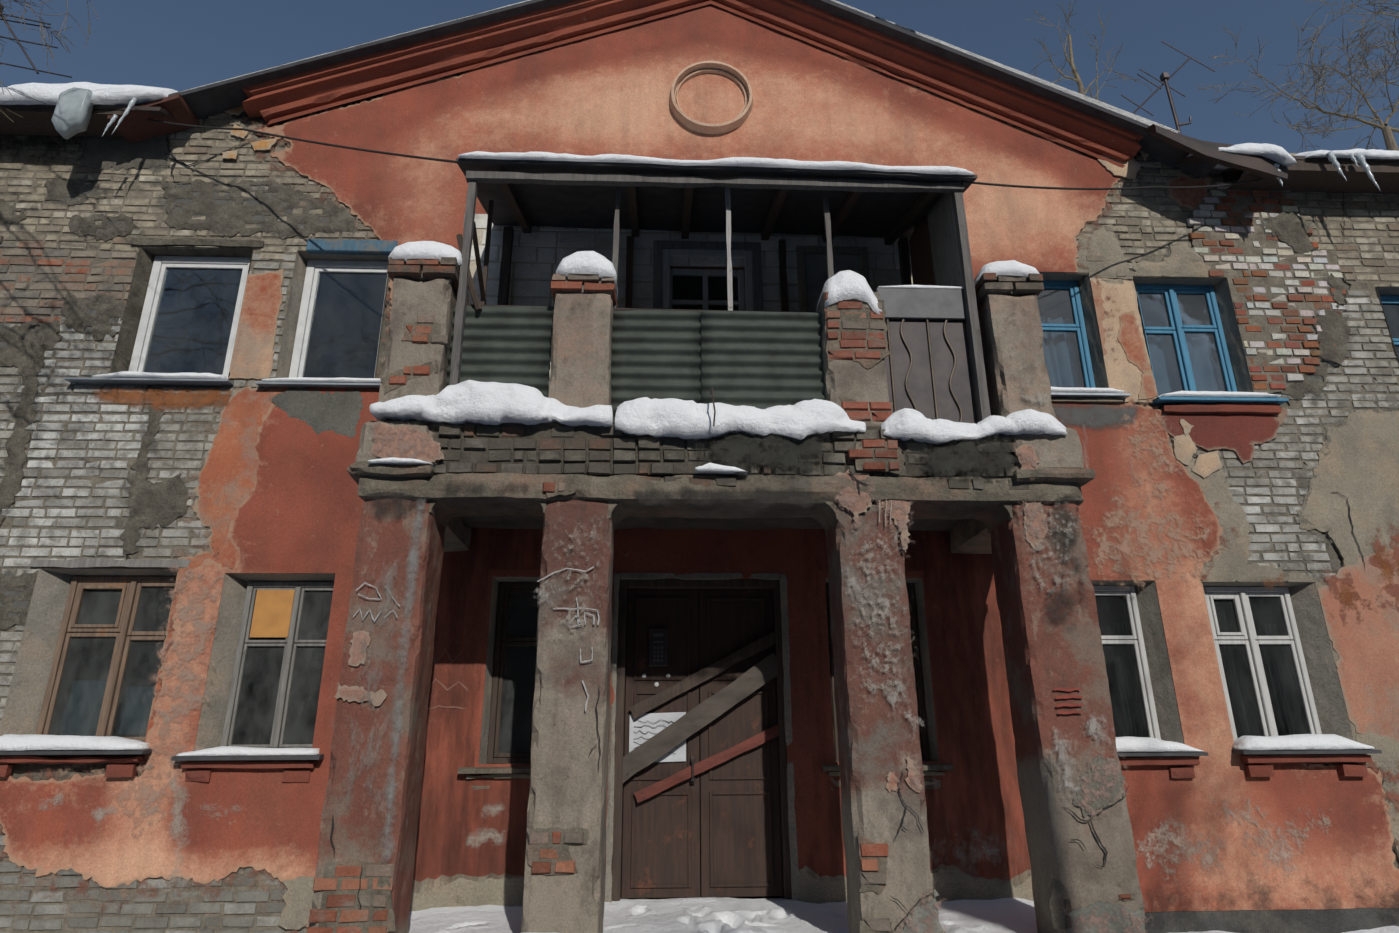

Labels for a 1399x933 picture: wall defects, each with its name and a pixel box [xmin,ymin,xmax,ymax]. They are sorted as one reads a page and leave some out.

flaking render [824,292,890,369]
flaking render [840,397,893,421]
flaking render [1023,151,1399,623]
flaking render [0,106,387,837]
crack [1332,492,1365,570]
flaking render [835,439,922,728]
flaking render [0,835,396,933]
flaking render [527,827,589,875]
crack [894,769,923,840]
crack [1068,786,1129,867]